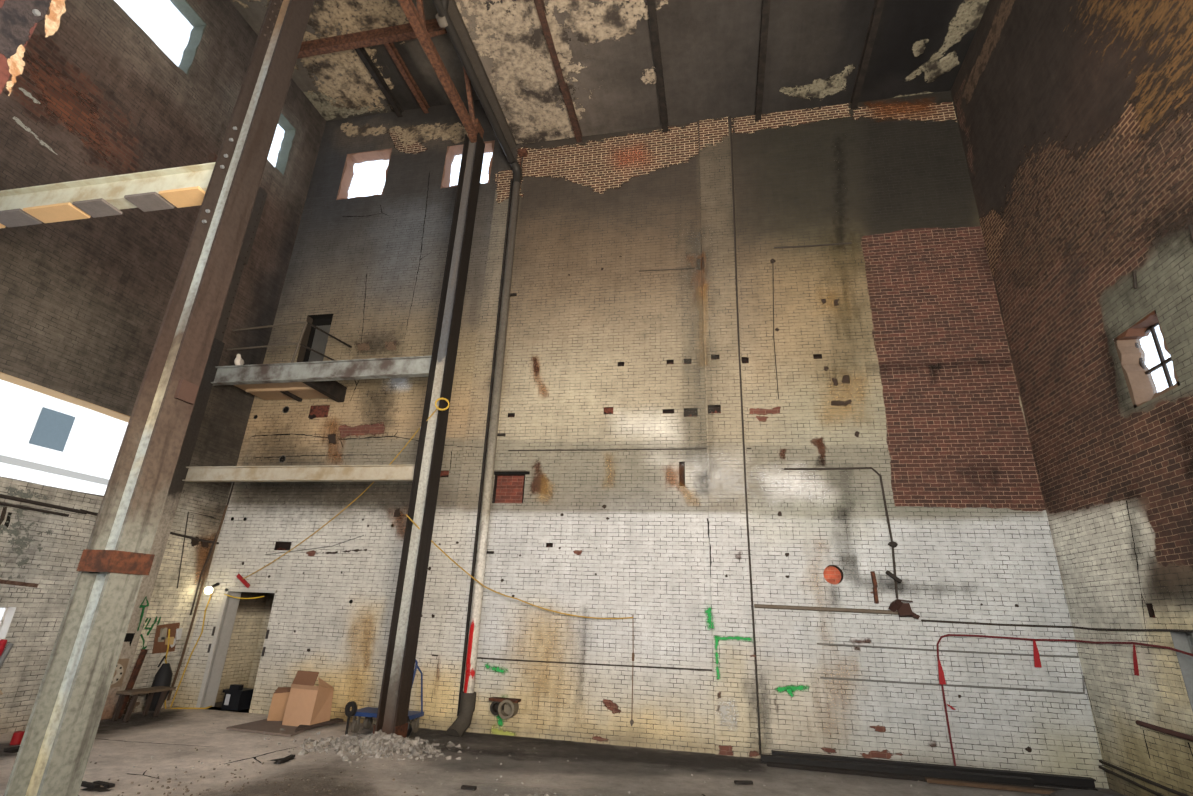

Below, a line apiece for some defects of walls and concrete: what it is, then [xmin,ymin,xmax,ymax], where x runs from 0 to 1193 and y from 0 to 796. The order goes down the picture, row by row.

spalling [0,0,112,166]
flaking render [456,0,1016,204]
spalling [979,0,1193,296]
crack [0,507,12,531]
peeling [0,487,63,591]
rust [530,461,552,494]